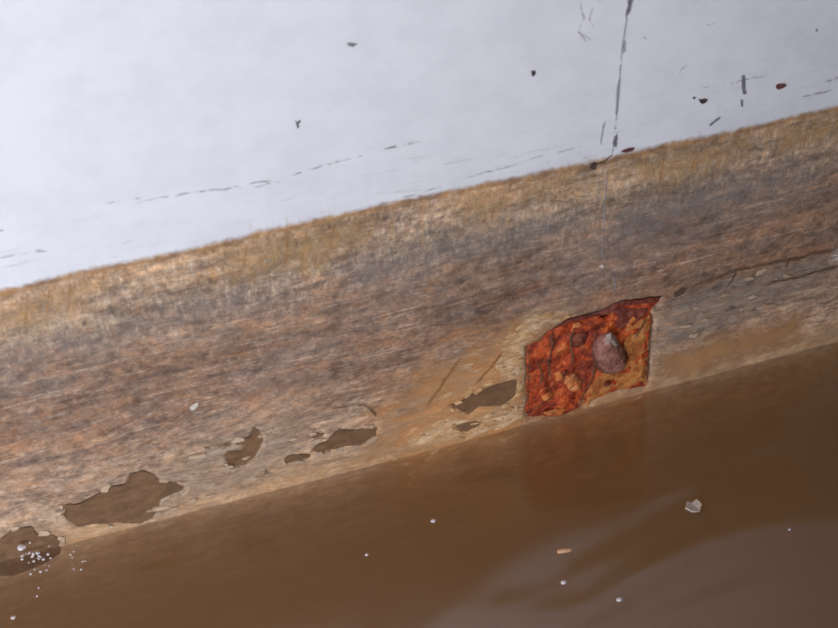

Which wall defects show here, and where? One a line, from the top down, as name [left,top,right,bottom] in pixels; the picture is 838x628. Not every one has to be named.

crack [595,0,633,290]
crack [698,248,838,288]
spalling [449,296,660,439]
corrosion [372,329,656,497]
peeling [188,428,273,472]
peeling [282,424,378,466]
peeling [60,471,190,528]
peeling [0,526,65,576]